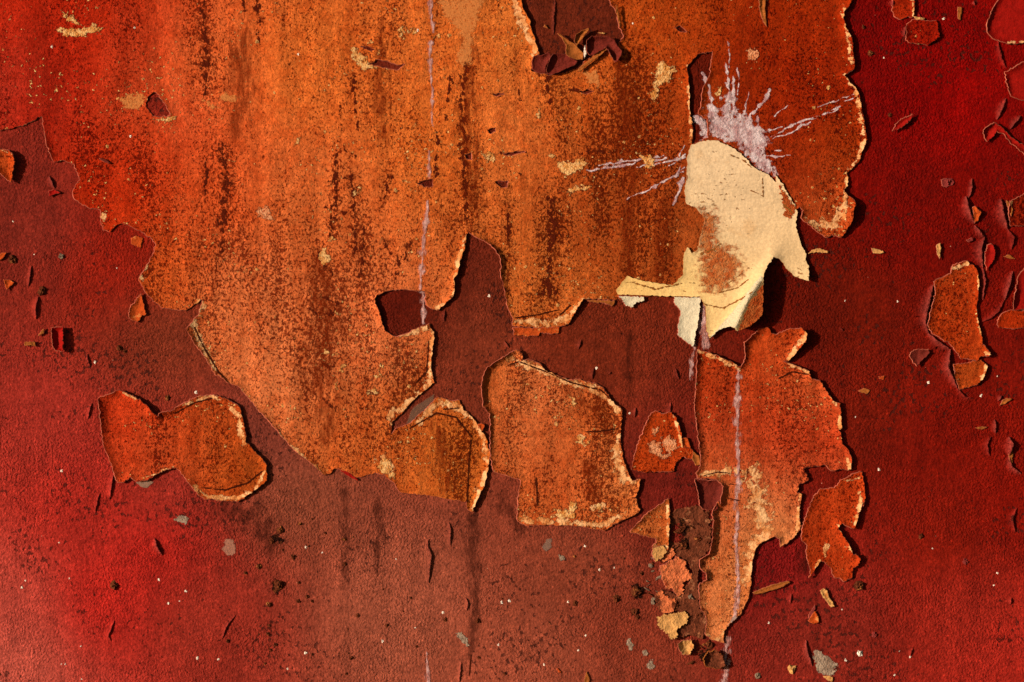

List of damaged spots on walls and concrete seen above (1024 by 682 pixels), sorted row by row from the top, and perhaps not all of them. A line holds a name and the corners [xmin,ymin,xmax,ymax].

rust [199,0,213,96]
rust [203,140,235,253]
rust [242,0,263,45]
rust [324,149,366,278]
rust [349,75,359,131]
rust [383,240,412,280]
peeling [0,0,868,531]
rust [431,131,443,178]
rust [444,58,477,220]
rust [536,195,564,303]
peeling [927,243,1024,390]
peeling [629,327,866,655]